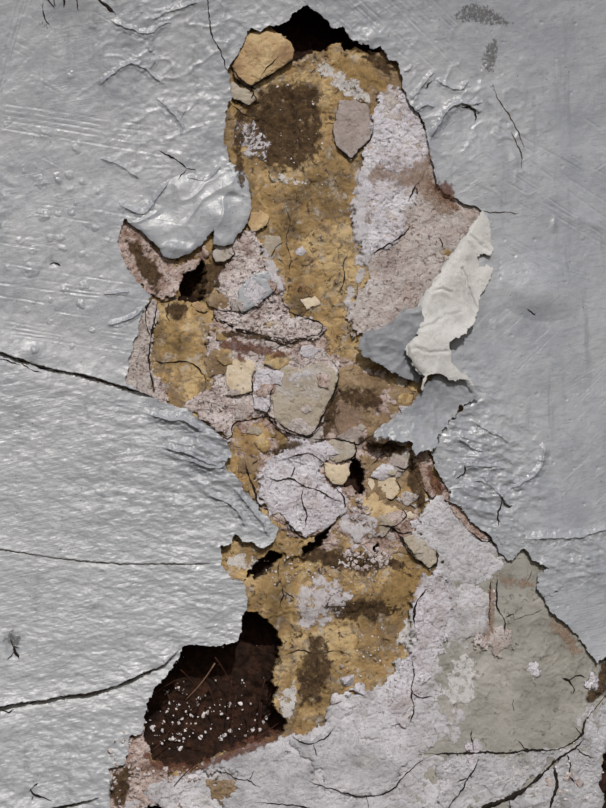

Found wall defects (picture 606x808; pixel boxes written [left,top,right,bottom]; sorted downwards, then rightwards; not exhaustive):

crack [42,0,78,24]
crack [99,0,115,13]
crack [160,151,195,178]
crack [0,297,206,398]
spalling [117,5,494,768]
crack [0,549,205,564]
spalling [108,494,606,808]
crack [0,651,178,713]
crack [295,728,334,755]
crack [302,699,603,808]
crack [30,783,101,808]
crack [225,770,309,808]